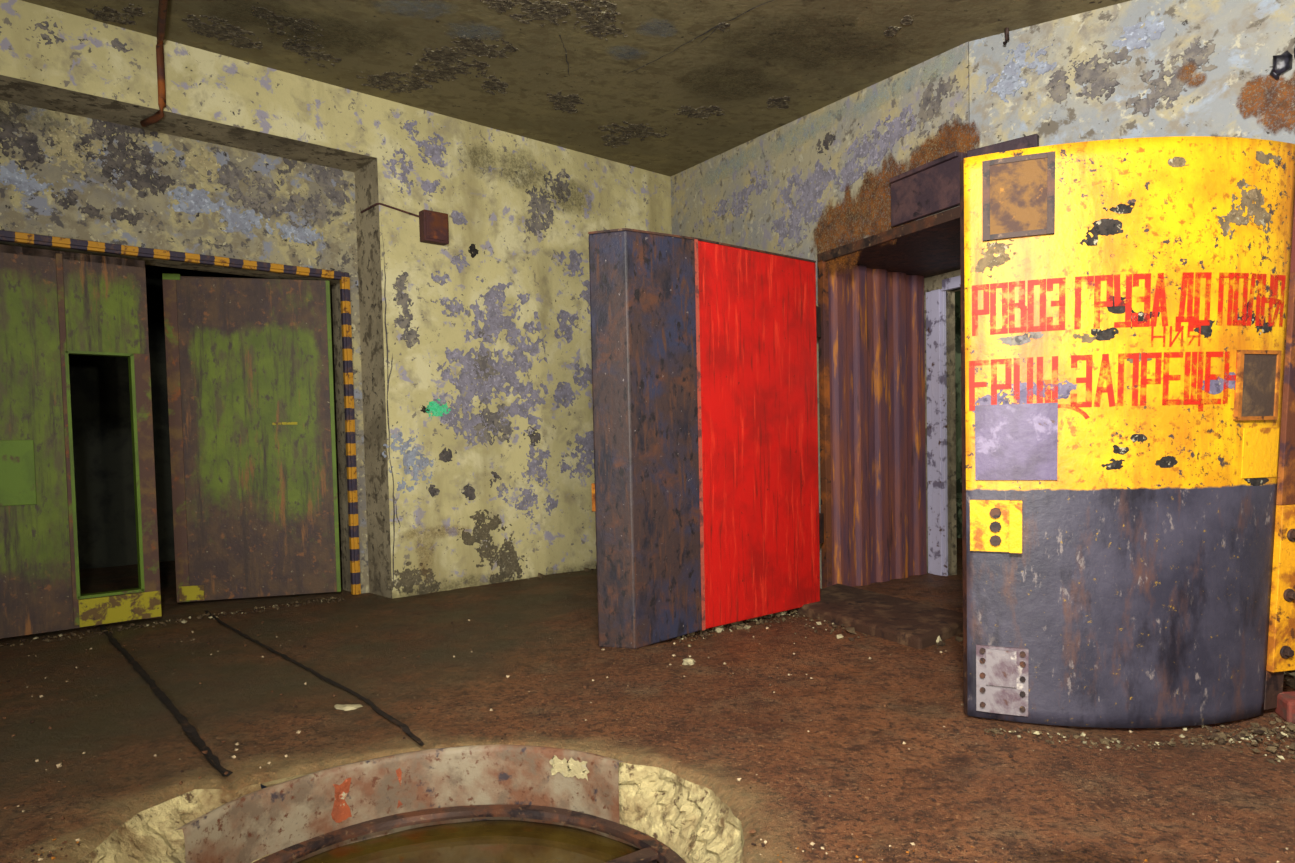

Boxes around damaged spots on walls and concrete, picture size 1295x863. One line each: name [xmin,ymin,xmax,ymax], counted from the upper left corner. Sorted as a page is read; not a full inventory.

rust [1237,72,1295,133]
peeling [0,100,354,245]
peeling [386,120,451,195]
peeling [523,171,573,238]
rust [812,122,979,275]
peeling [382,244,594,584]
flaking render [387,561,441,595]
spalling [78,772,314,863]
peeling [549,755,589,781]
spalling [618,762,746,863]